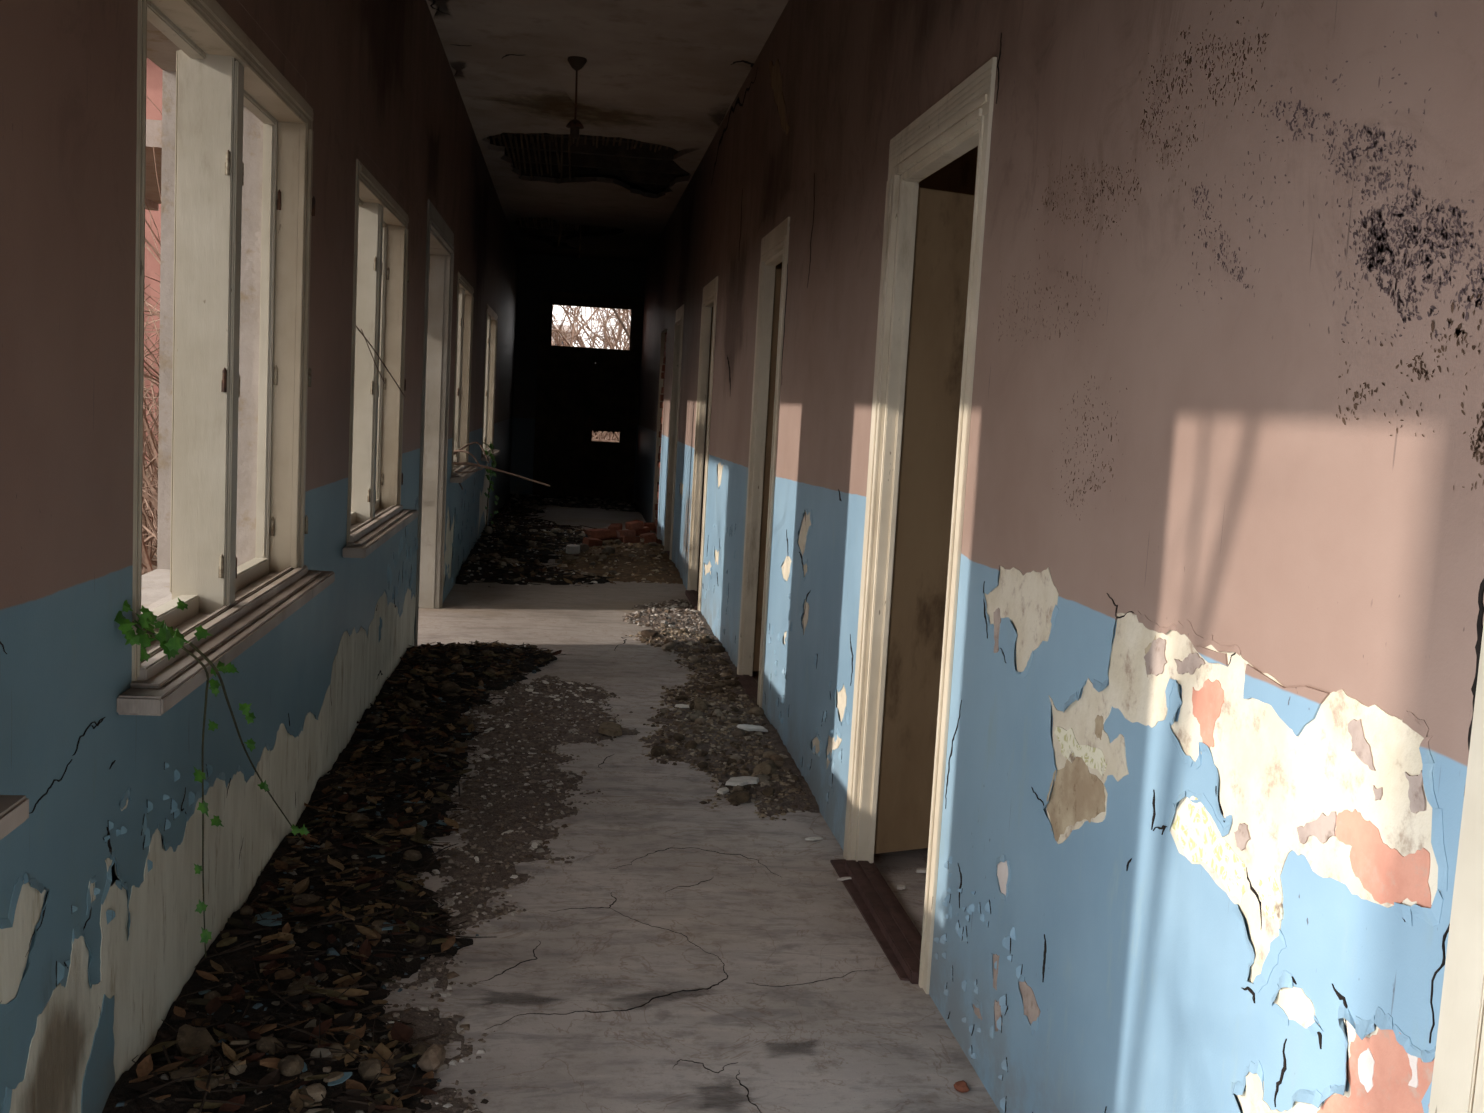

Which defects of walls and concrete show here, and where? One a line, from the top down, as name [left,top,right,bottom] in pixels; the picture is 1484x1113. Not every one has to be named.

spalling [478,131,704,199]
water stain [993,0,1484,491]
water stain [1052,375,1127,520]
peeling [762,509,813,724]
peeling [983,565,1059,678]
crack [29,717,105,814]
peeling [0,586,416,1113]
crack [479,847,868,1030]
peeling [800,680,850,803]
peeling [934,854,1041,1059]
peeling [1031,593,1448,1113]
crack [674,1059,761,1113]